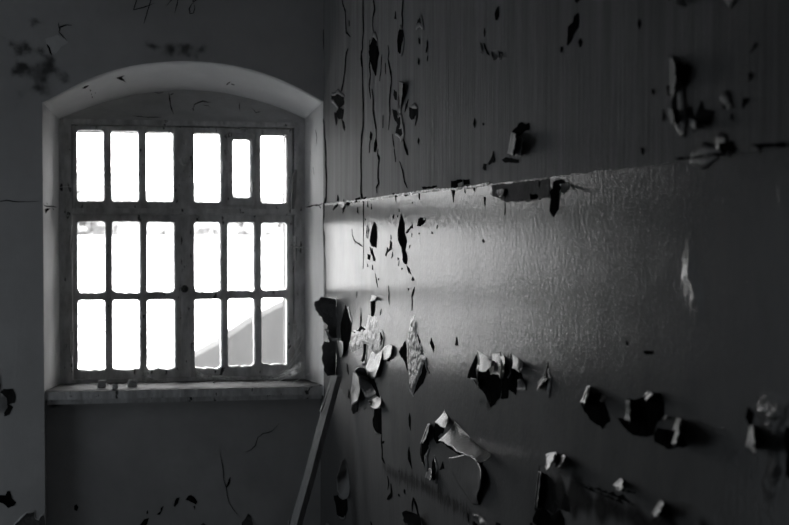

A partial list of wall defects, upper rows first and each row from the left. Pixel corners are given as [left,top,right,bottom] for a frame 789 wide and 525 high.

peeling [368,31,379,76]
peeling [662,56,750,137]
peeling [483,122,530,170]
peeling [324,178,570,217]
peeling [385,211,426,290]
peeling [314,219,408,434]
peeling [413,334,434,395]
peeling [467,351,526,407]
peeling [408,410,491,505]
peeling [530,452,570,525]
peeling [580,386,688,449]
peeling [745,425,756,455]